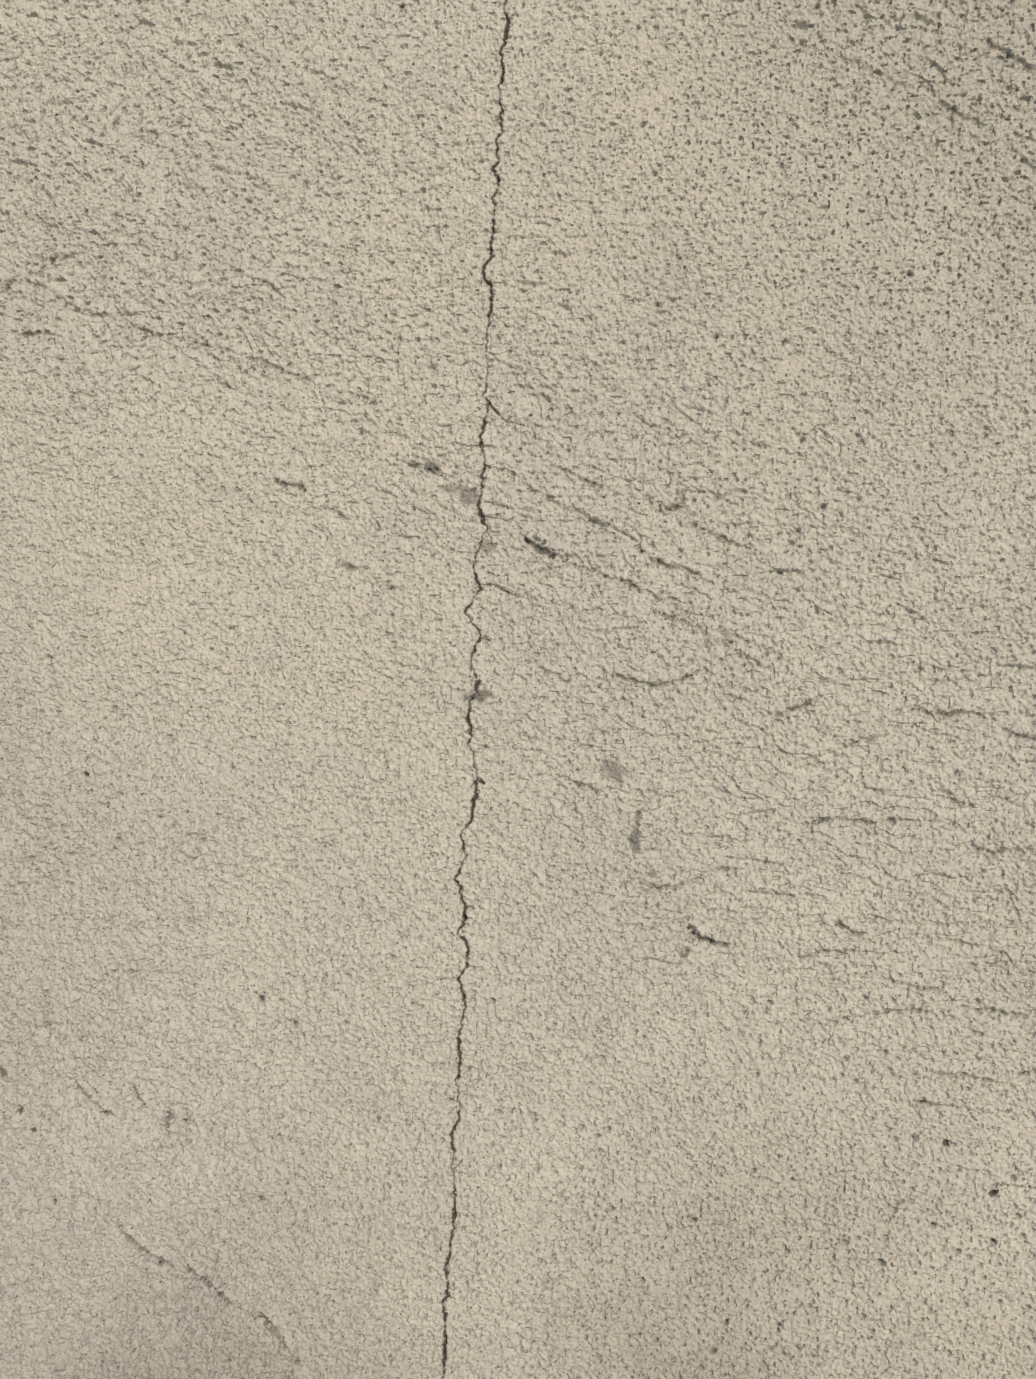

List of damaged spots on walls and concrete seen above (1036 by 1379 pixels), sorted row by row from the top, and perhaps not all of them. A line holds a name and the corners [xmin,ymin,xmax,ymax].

crack [441,0,525,1378]